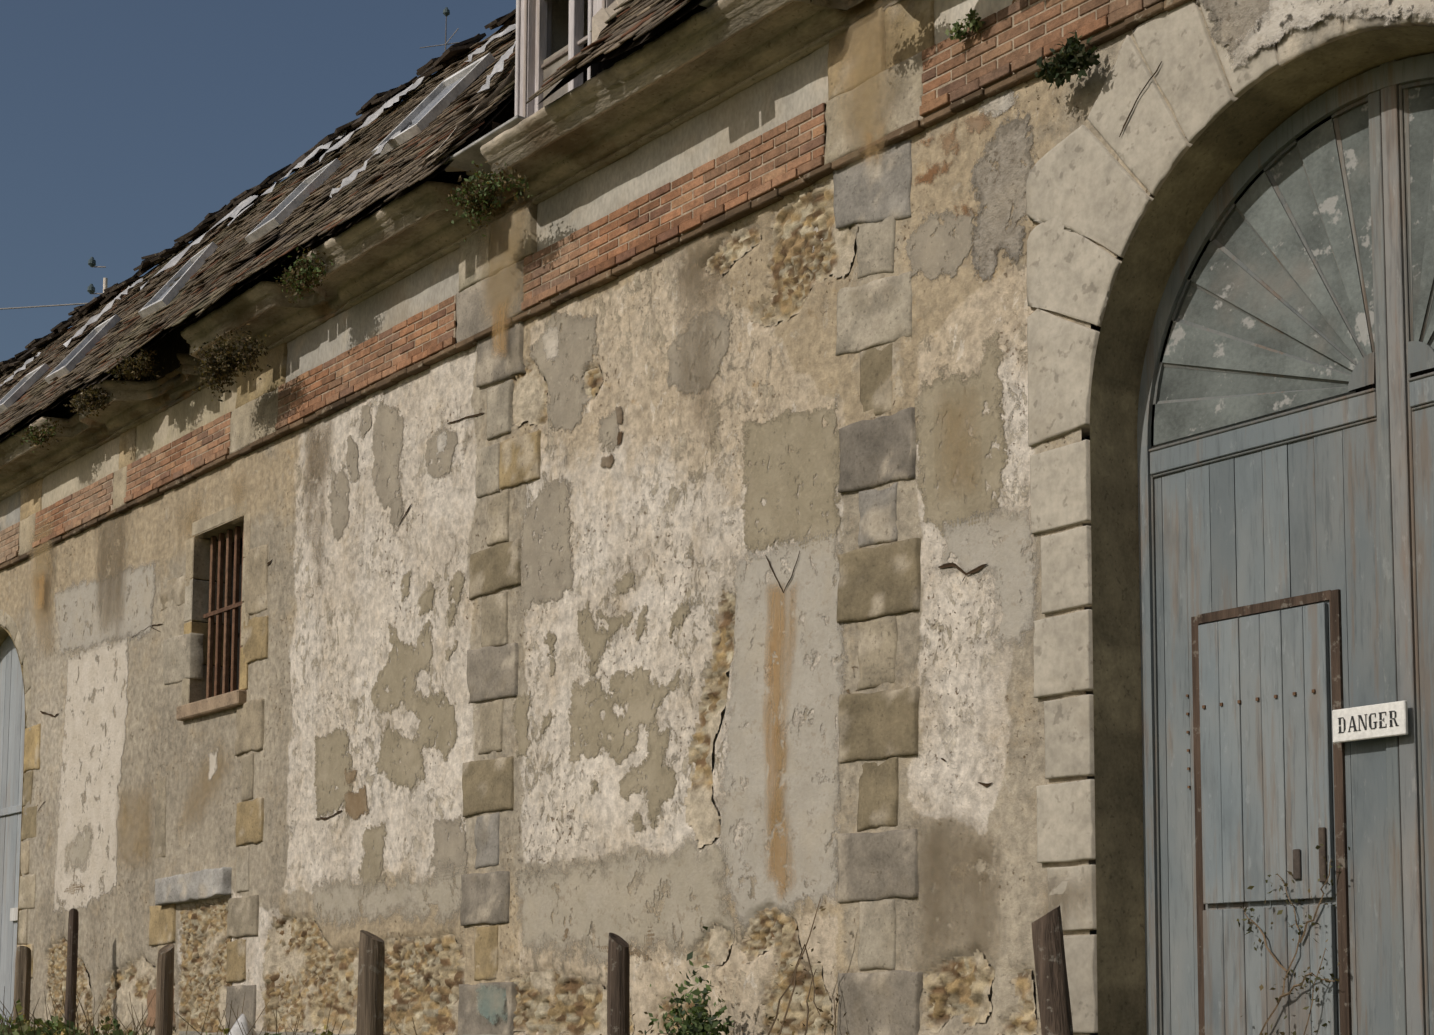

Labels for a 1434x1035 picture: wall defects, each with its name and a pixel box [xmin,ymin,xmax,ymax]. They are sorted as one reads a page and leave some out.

flaking render [704,177,858,328]
flaking render [519,475,574,611]
flaking render [371,569,465,792]
flaking render [511,570,736,848]
corrosion [767,589,786,890]
flaking render [314,727,387,895]
flaking render [44,936,157,1035]
flaking render [261,915,359,1034]
flaking render [383,932,466,1035]
flaking render [510,969,607,1035]
flaking render [691,907,833,1035]
flaking render [922,949,1038,1035]